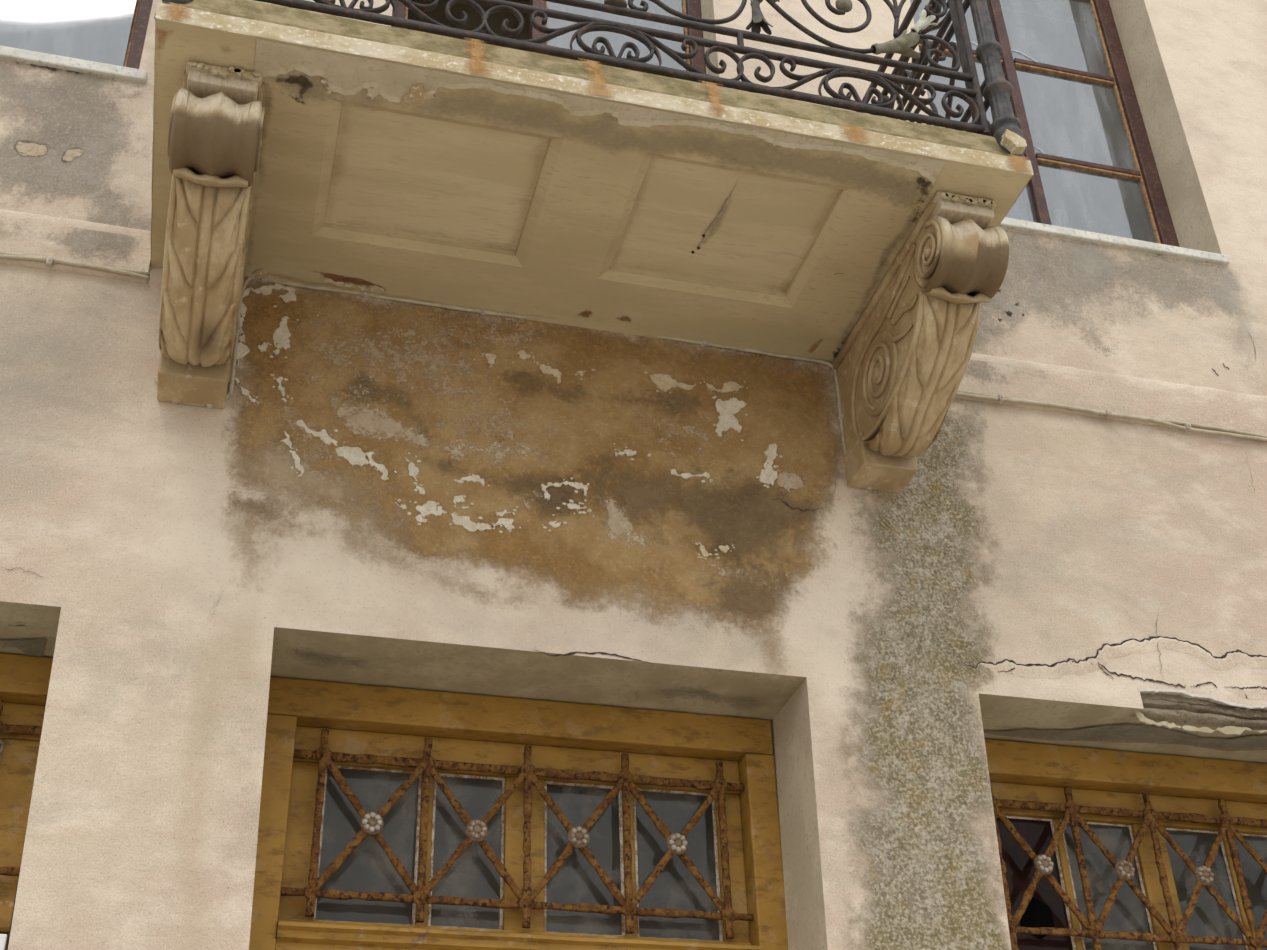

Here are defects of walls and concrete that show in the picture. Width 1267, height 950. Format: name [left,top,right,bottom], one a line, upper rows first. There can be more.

water stain [0,62,151,258]
corrosion [468,38,487,74]
peeling [186,39,997,208]
corrosion [586,60,612,97]
corrosion [702,81,722,117]
water stain [967,231,1236,380]
peeling [644,371,748,441]
peeling [280,420,521,533]
water stain [236,284,843,661]
crack [534,649,654,701]
crack [963,618,1267,700]
flaking render [1134,688,1267,736]